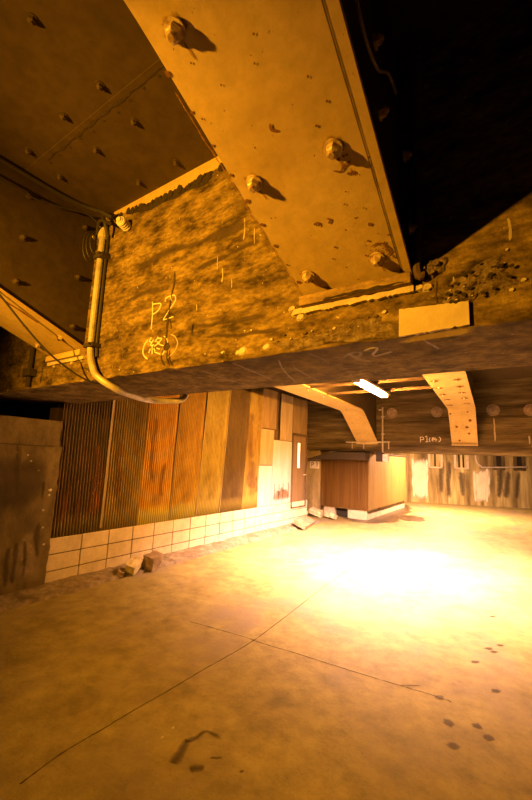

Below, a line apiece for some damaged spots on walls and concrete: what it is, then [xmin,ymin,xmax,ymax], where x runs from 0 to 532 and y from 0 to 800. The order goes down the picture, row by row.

spalling [262,248,528,351]
leakage [411,458,428,498]
leakage [439,463,520,502]